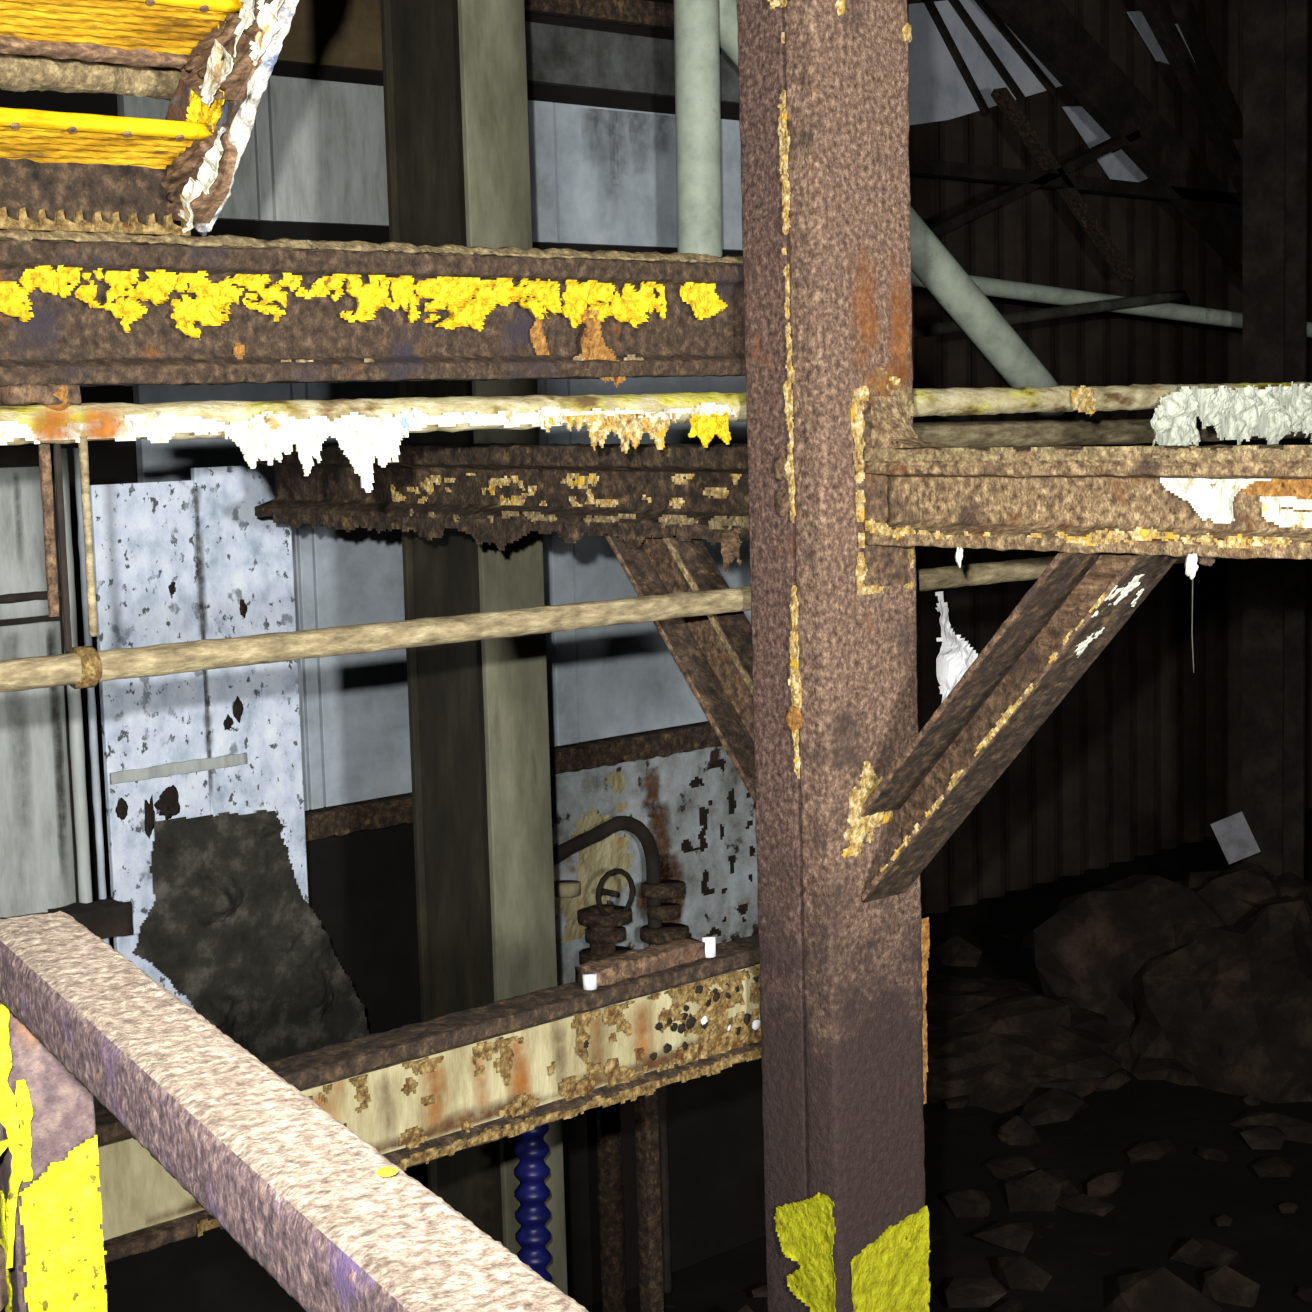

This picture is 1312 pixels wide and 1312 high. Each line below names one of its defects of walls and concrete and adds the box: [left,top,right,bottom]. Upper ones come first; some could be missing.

peeling [178,0,284,233]
peeling [0,265,728,388]
corrosion [774,90,796,523]
corrosion [786,585,803,779]
corrosion [841,761,893,858]
corrosion [880,770,963,873]
corrosion [974,683,1034,756]
corrosion [851,314,1312,595]
corrosion [1027,527,1311,663]
peeling [1160,477,1312,528]
corrosion [376,965,762,1171]
corrosion [921,917,930,1104]